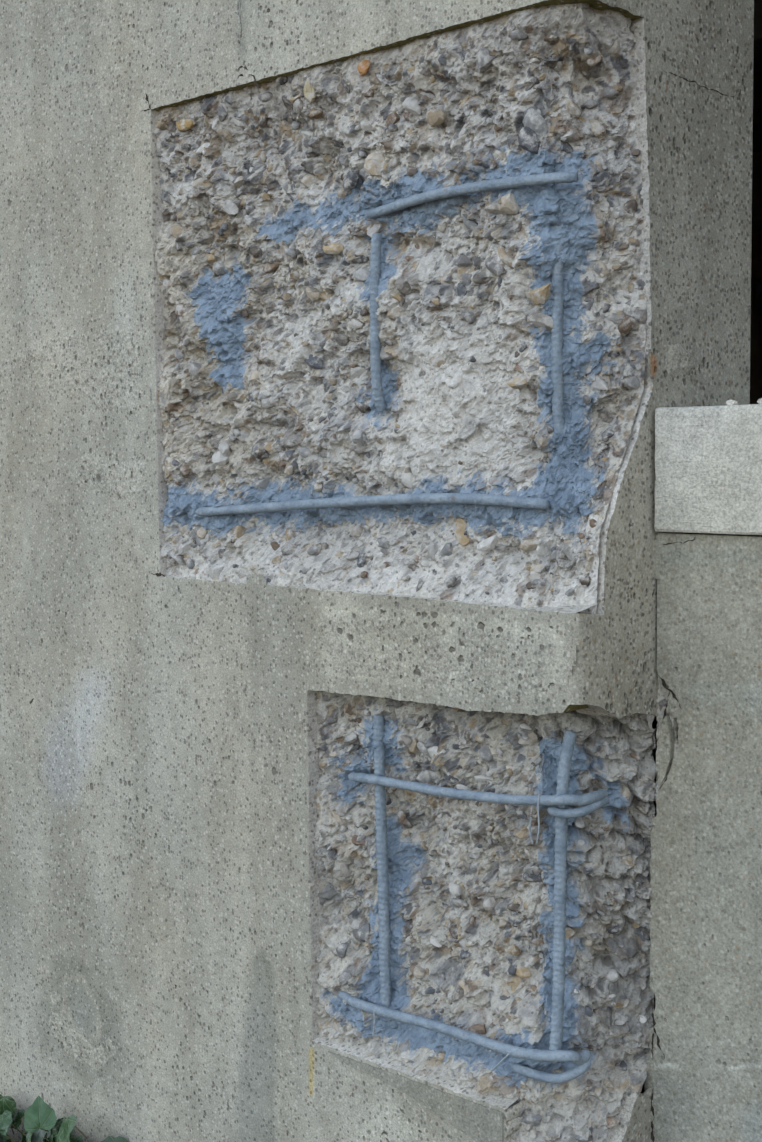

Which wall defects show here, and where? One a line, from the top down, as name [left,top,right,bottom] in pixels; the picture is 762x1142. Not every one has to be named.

spalling [2,0,701,615]
spalling [316,612,557,697]
crack [658,675,681,723]
spalling [307,672,680,1142]
peeling [30,937,135,1106]
crack [651,999,665,1058]
crack [649,1085,657,1142]